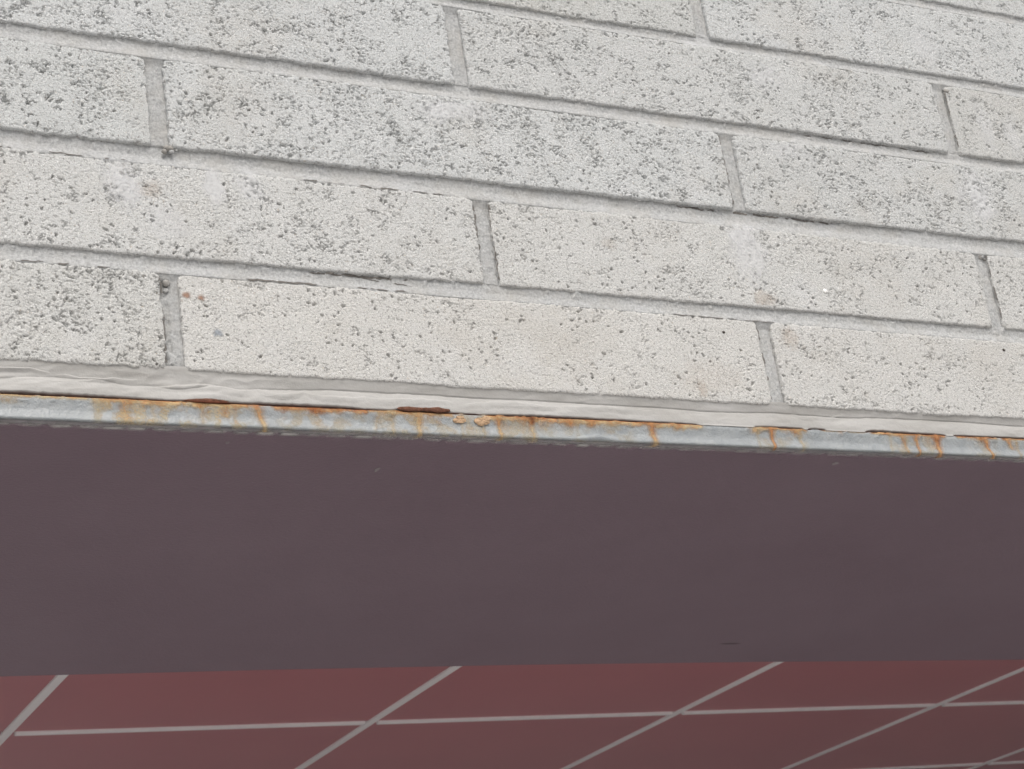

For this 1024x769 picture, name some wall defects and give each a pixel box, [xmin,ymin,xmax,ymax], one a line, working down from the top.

corrosion [0,394,452,438]
corrosion [486,415,702,447]
corrosion [752,427,806,451]
corrosion [857,432,944,458]
corrosion [957,436,1024,459]